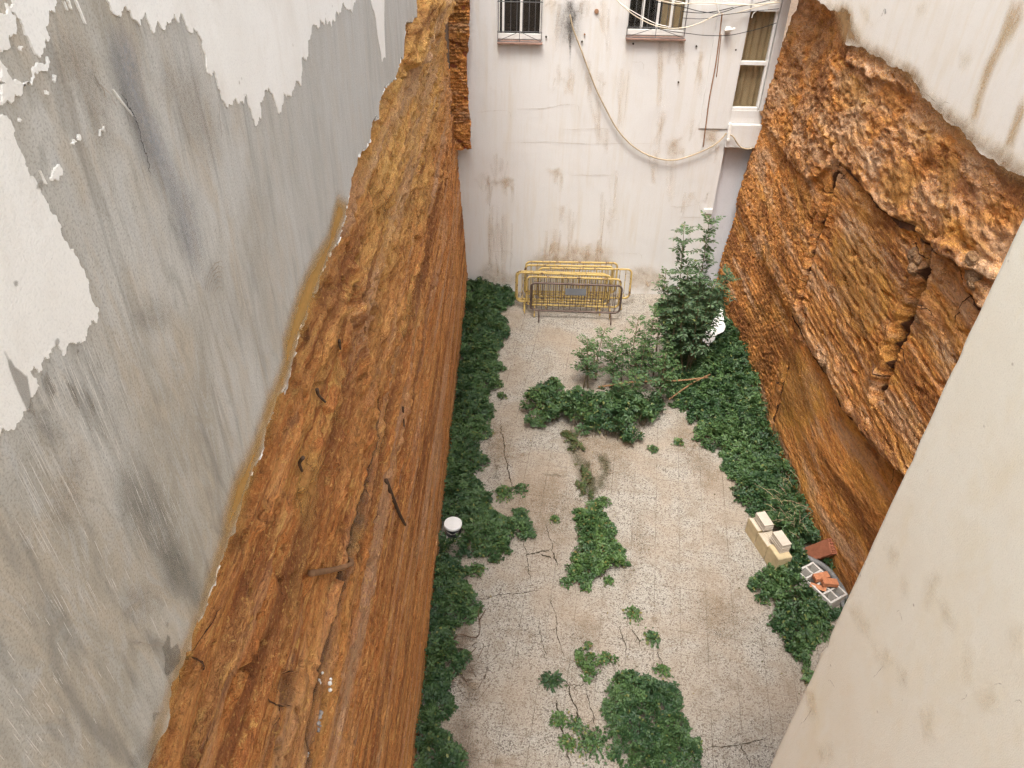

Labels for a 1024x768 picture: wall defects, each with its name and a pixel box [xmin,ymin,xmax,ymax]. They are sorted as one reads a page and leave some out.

peeling [106,0,356,126]
peeling [371,0,386,62]
peeling [0,0,99,433]
crack [792,220,853,421]
crack [823,164,981,390]
crack [500,426,512,486]
crack [487,524,563,658]
crack [556,681,596,765]
crack [711,739,764,765]